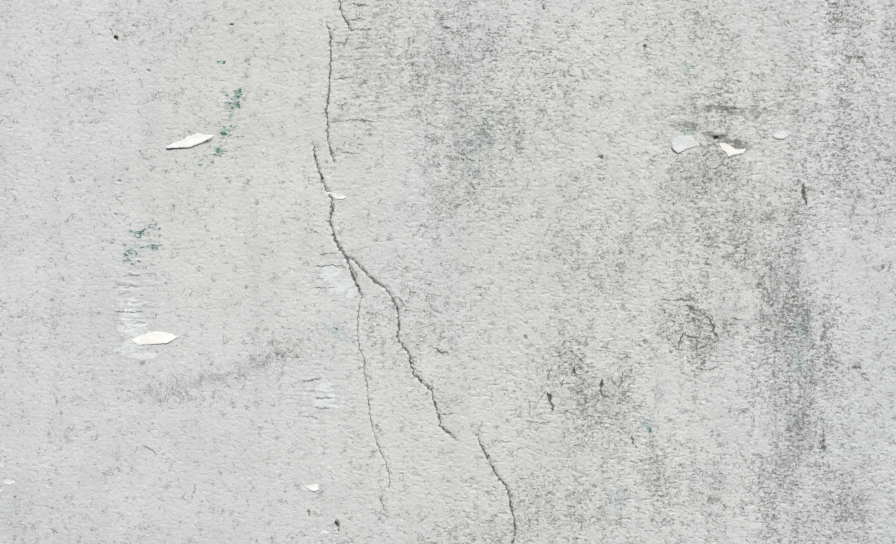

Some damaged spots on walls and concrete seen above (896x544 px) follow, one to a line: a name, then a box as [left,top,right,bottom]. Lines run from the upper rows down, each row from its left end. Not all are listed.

peeling [166,133,214,150]
peeling [672,135,700,153]
peeling [719,143,746,157]
crack [310,0,455,509]
peeling [118,330,177,360]
crack [478,438,516,544]